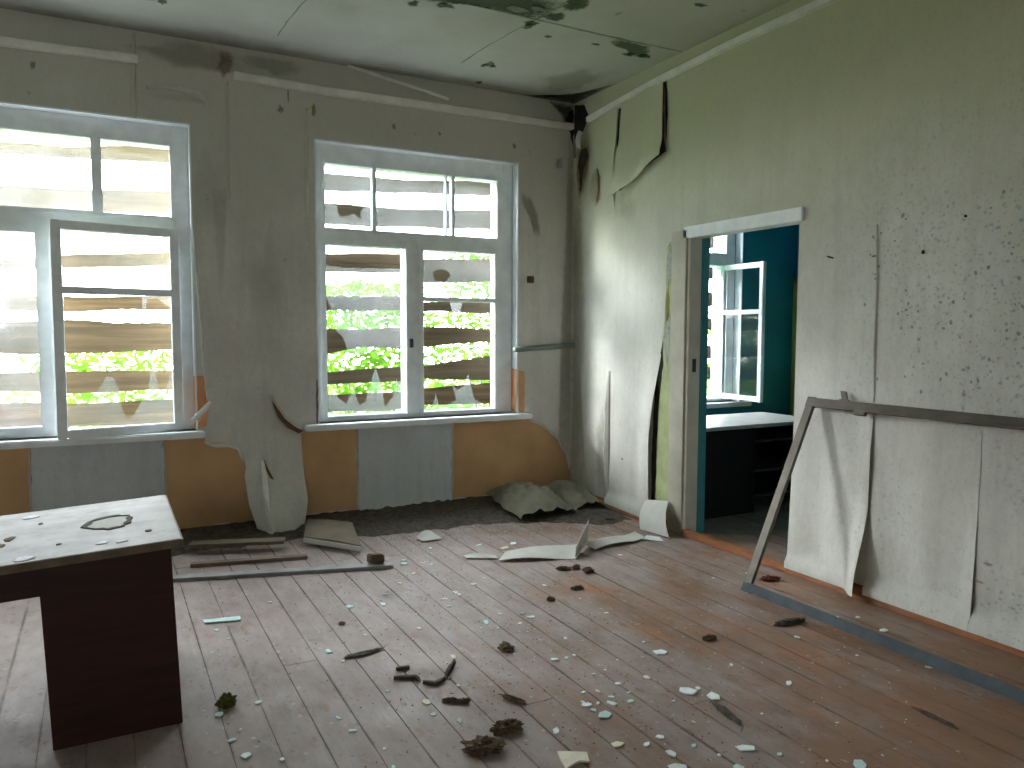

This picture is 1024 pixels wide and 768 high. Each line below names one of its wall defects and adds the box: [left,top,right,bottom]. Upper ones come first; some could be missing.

water stain [409,0,589,29]
water stain [591,41,650,58]
spalling [573,105,588,191]
peeling [607,81,668,198]
peeling [301,379,359,515]
peeling [451,369,571,499]
peeling [655,241,672,515]